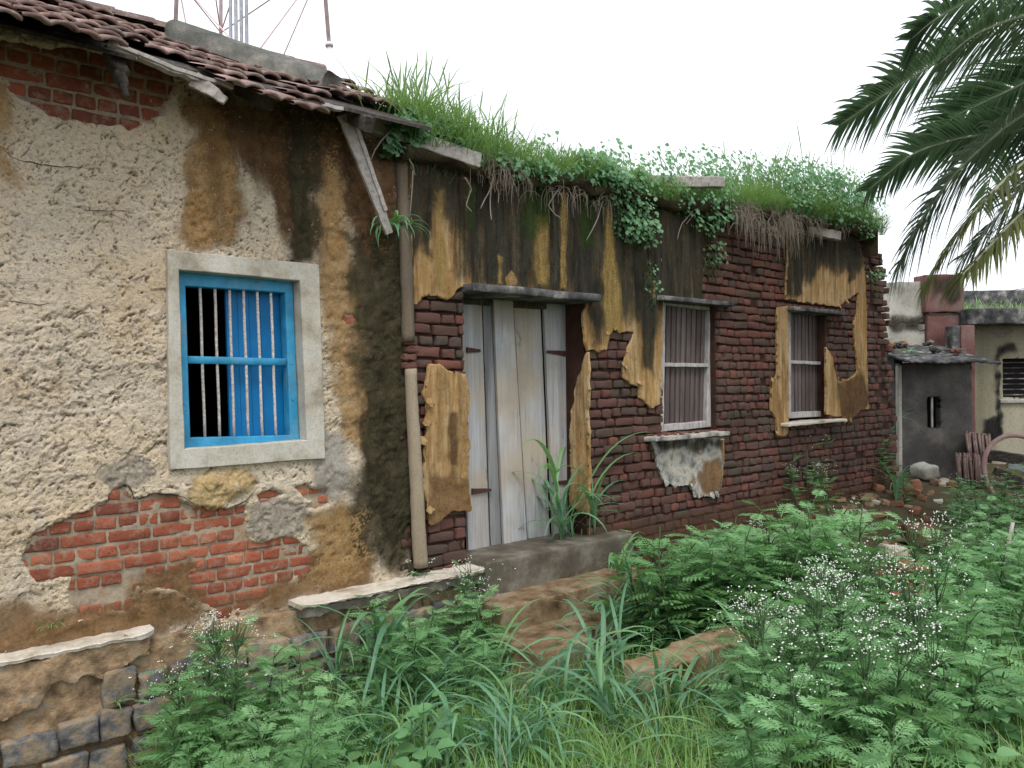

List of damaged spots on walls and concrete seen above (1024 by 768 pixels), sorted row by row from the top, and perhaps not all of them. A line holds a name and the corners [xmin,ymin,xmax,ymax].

flaking render [0,40,174,130]
water stain [181,89,723,543]
peeling [408,161,664,525]
peeling [769,232,870,436]
flaking render [21,457,328,619]
peeling [651,437,724,499]